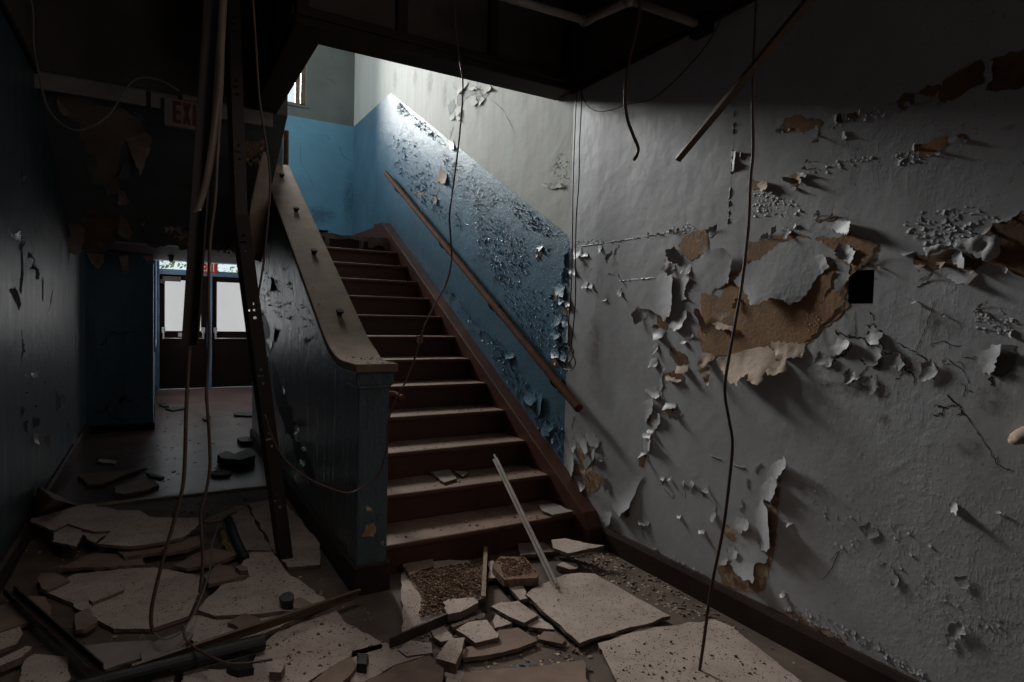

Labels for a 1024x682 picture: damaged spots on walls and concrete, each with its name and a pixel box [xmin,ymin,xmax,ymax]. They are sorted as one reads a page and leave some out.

peeling [773,49,1024,143]
peeling [892,133,967,166]
peeling [8,227,53,311]
peeling [205,234,235,254]
peeling [388,81,622,376]
peeling [899,205,1024,287]
peeling [444,155,883,593]
crack [814,302,1012,470]
peeling [771,590,926,682]